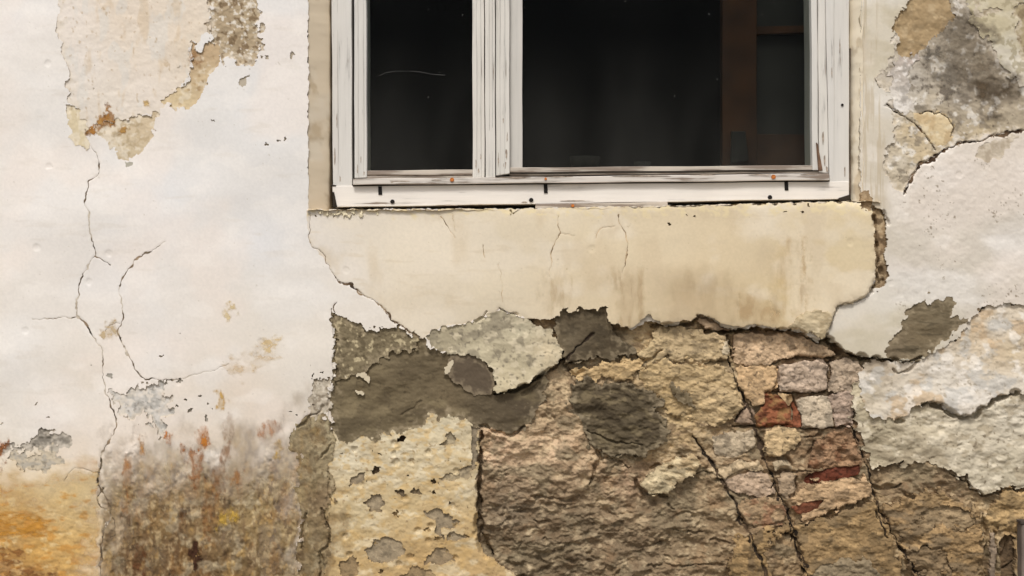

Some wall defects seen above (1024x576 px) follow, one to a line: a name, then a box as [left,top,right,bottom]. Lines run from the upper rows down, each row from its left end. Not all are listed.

corrosion [85,104,127,135]
peeling [56,0,269,167]
peeling [875,0,1024,194]
crack [886,104,1024,194]
peeling [1,416,72,474]
crack [33,150,226,574]
peeling [106,373,213,441]
leakage [0,432,332,576]
spalling [288,303,1024,576]
crack [692,436,768,576]
crack [727,356,809,576]
crack [850,425,921,576]